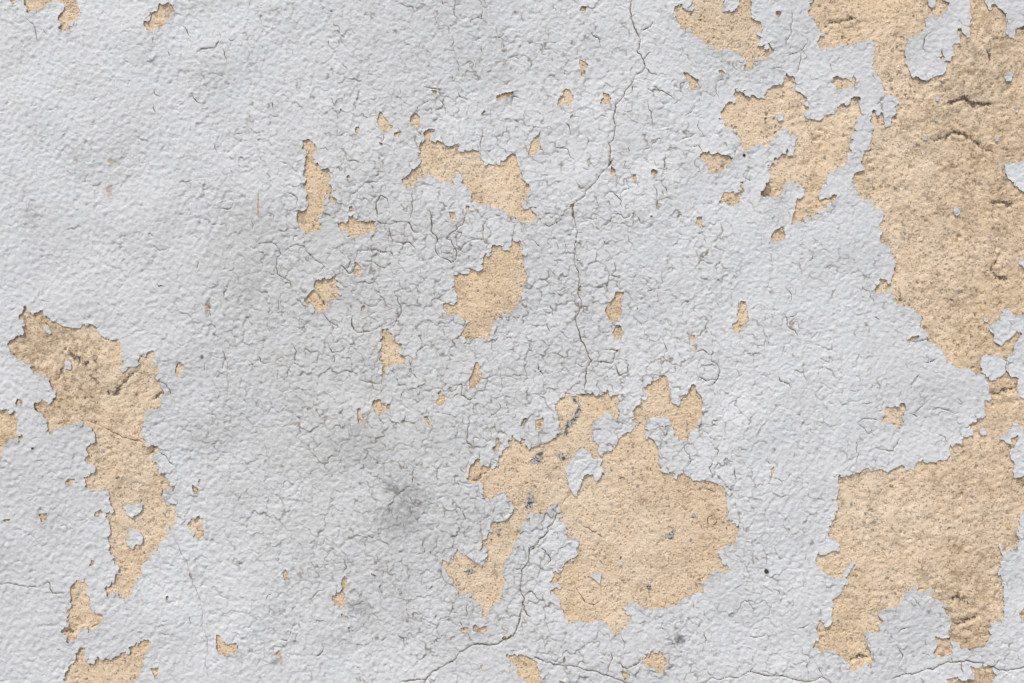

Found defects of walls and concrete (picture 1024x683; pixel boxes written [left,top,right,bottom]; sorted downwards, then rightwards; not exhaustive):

crack [183,26,233,62]
peeling [671,0,774,71]
peeling [401,113,541,224]
crack [252,0,706,391]
crack [204,343,303,377]
peeling [699,0,1024,683]
peeling [0,304,205,602]
crack [453,384,507,481]
peeling [442,373,740,637]
peeling [59,579,159,683]
crack [399,496,569,682]
crack [535,622,671,683]